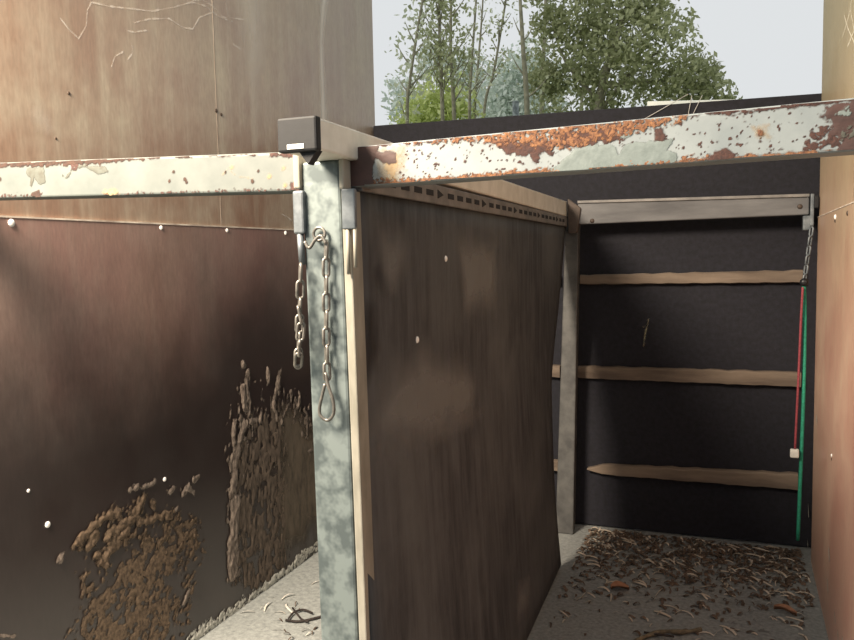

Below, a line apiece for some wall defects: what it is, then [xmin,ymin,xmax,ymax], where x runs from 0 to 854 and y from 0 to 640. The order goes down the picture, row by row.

peeling [26,167,45,186]
corrosion [373,99,853,184]